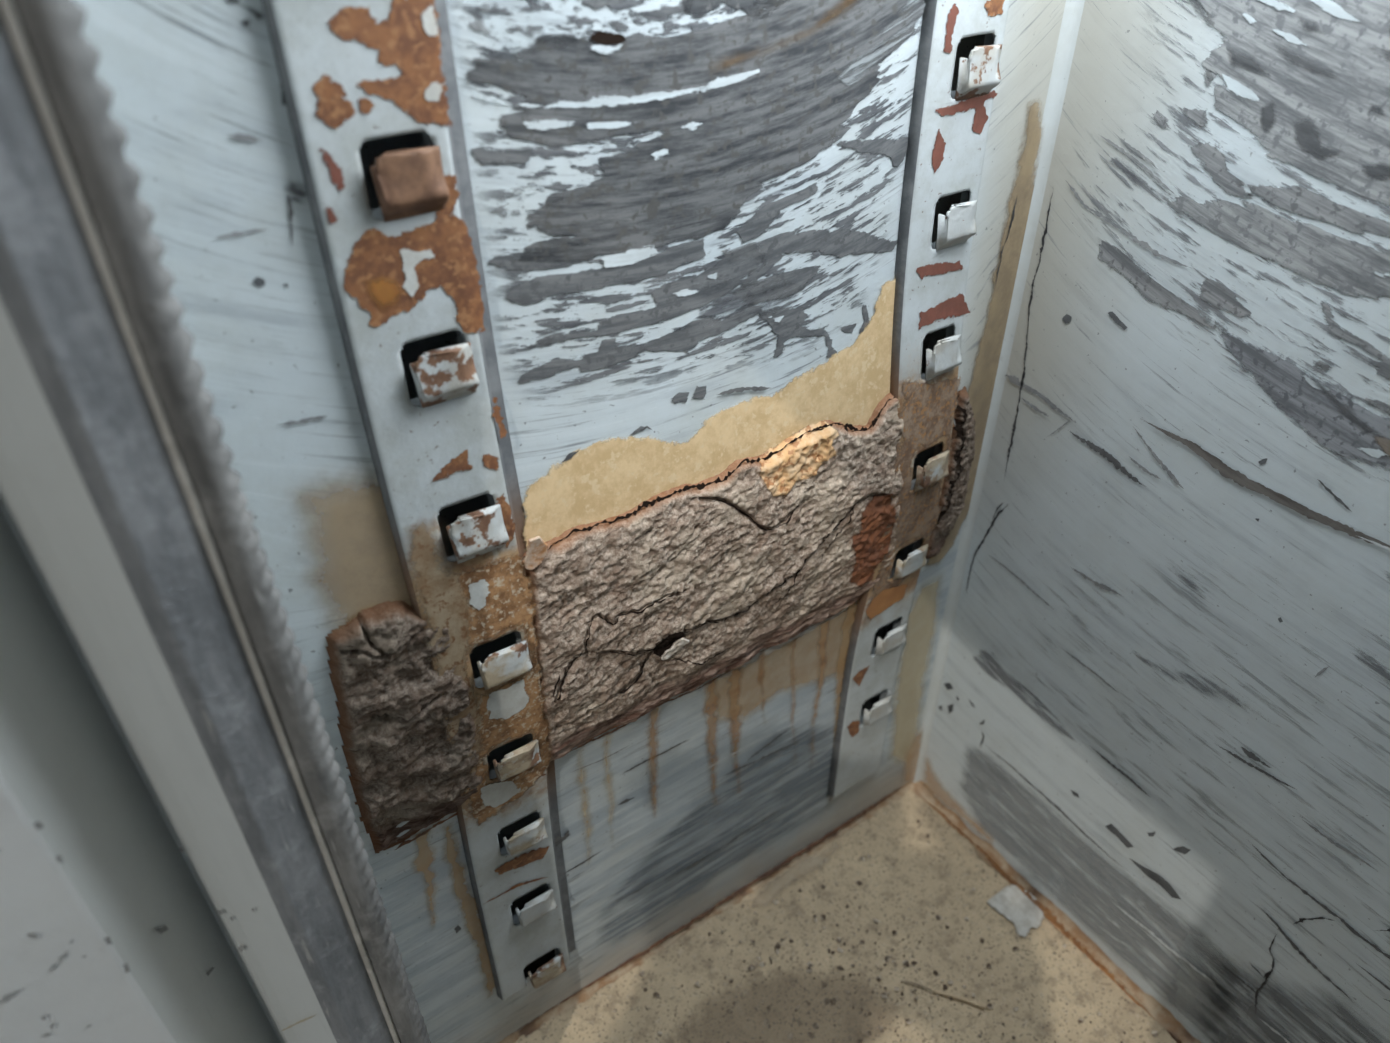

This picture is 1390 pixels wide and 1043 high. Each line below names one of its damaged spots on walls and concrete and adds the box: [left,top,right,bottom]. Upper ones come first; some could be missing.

rust [312,0,453,129]
rust [343,174,486,333]
peeling [463,0,926,394]
rust [932,90,997,173]
peeling [1086,0,1390,469]
rust [458,495,552,826]
peeling [671,386,707,404]
peeling [523,393,904,762]
crack [553,494,882,751]
rust [704,378,961,790]
spalling [1143,420,1390,550]
crack [1222,917,1335,1013]